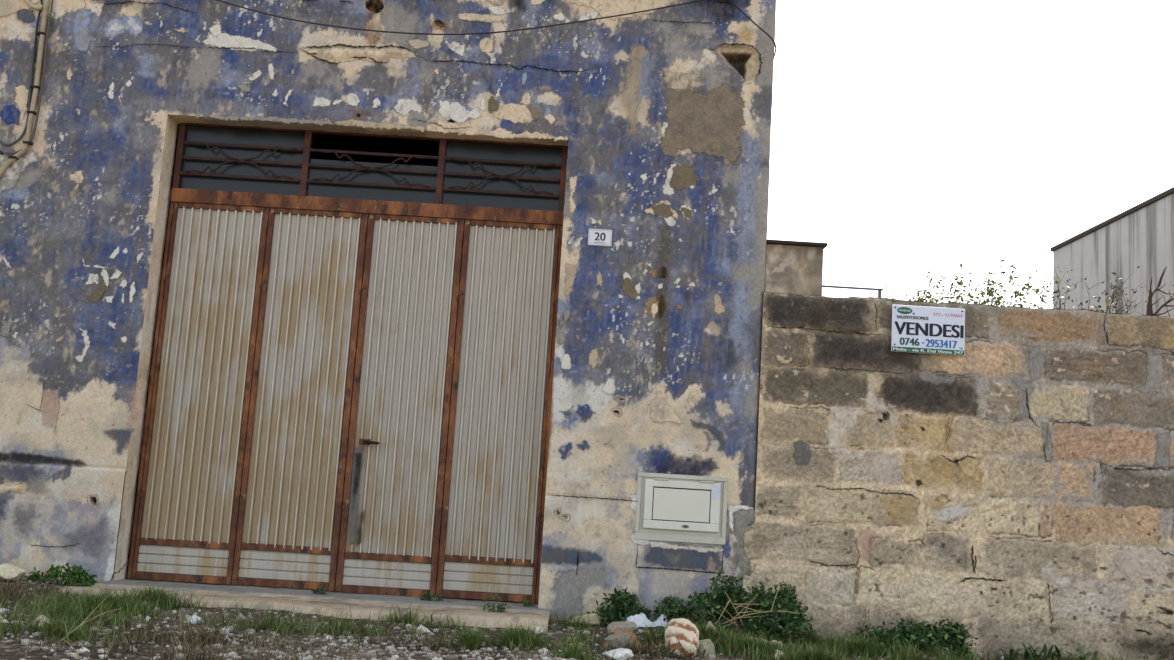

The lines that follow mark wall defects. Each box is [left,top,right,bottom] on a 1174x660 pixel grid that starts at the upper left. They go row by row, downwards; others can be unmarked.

spalling [363,0,385,15]
peeling [459,0,515,23]
peeling [554,0,675,23]
peeling [0,85,29,125]
peeling [196,19,568,141]
flaking render [645,43,762,226]
peeling [83,246,143,303]
peeling [618,263,695,326]
water stain [104,386,141,453]
water stain [0,452,85,493]
corrosion [349,446,364,545]
peeling [558,440,590,459]